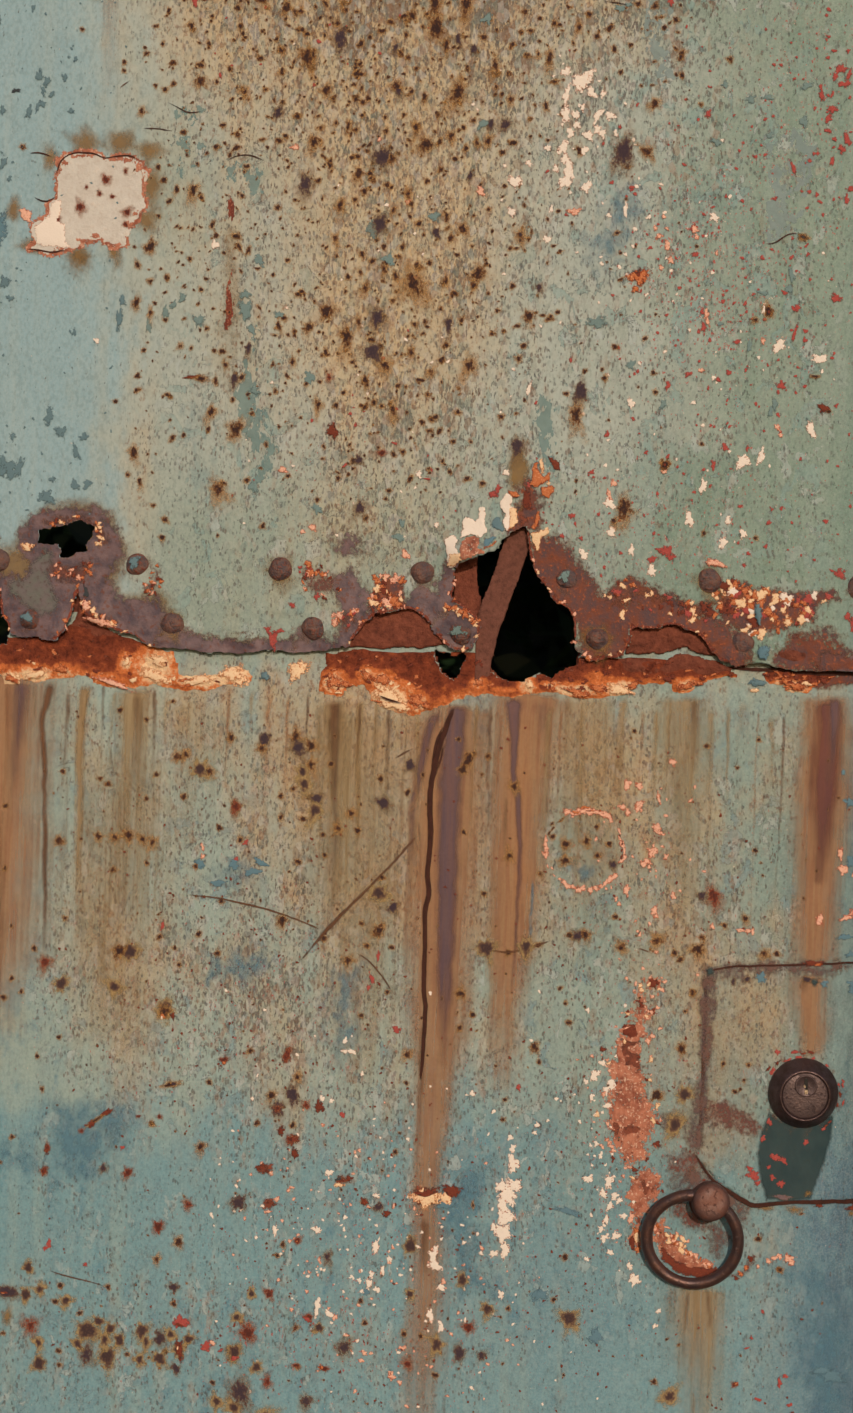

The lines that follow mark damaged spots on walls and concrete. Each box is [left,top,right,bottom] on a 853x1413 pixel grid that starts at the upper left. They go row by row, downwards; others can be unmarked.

peeling [0,275,14,301]
peeling [0,105,208,261]
rust [131,0,703,502]
peeling [507,160,533,189]
peeling [544,67,619,216]
peeling [479,1135,523,1259]
rust [0,1255,324,1413]